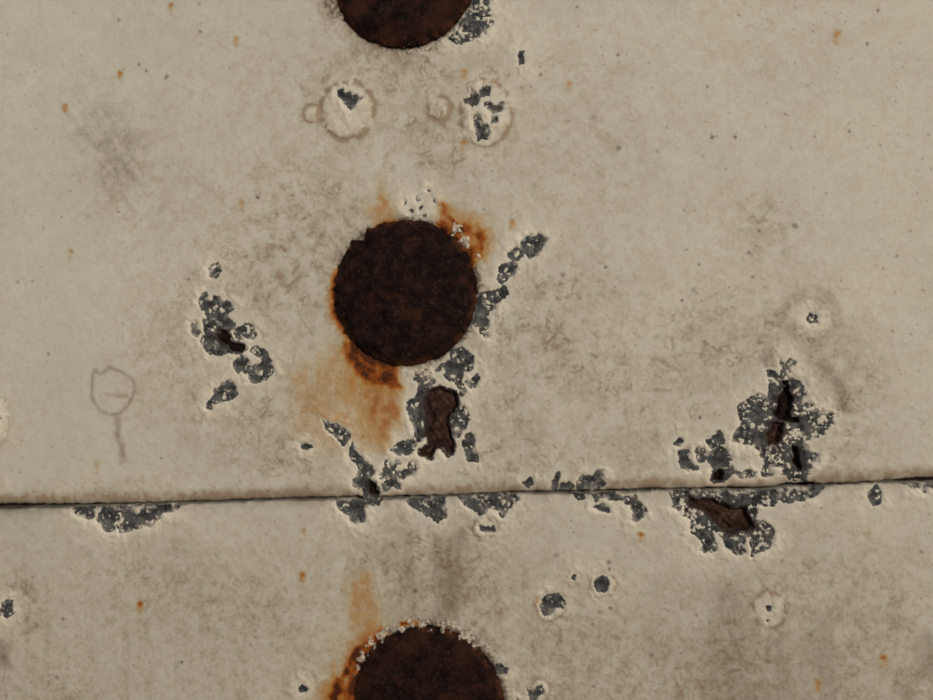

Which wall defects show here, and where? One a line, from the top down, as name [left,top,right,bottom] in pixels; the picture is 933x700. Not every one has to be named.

peeling [404,0,494,54]
peeling [337,88,363,110]
peeling [463,85,505,142]
corrosion [435,202,489,267]
peeling [468,233,549,338]
peeling [190,292,274,410]
corrosion [318,269,404,445]
peeling [72,503,183,534]
peeling [322,346,520,533]
peeling [551,469,648,522]
peeling [667,358,835,557]
corrosion [322,576,388,700]